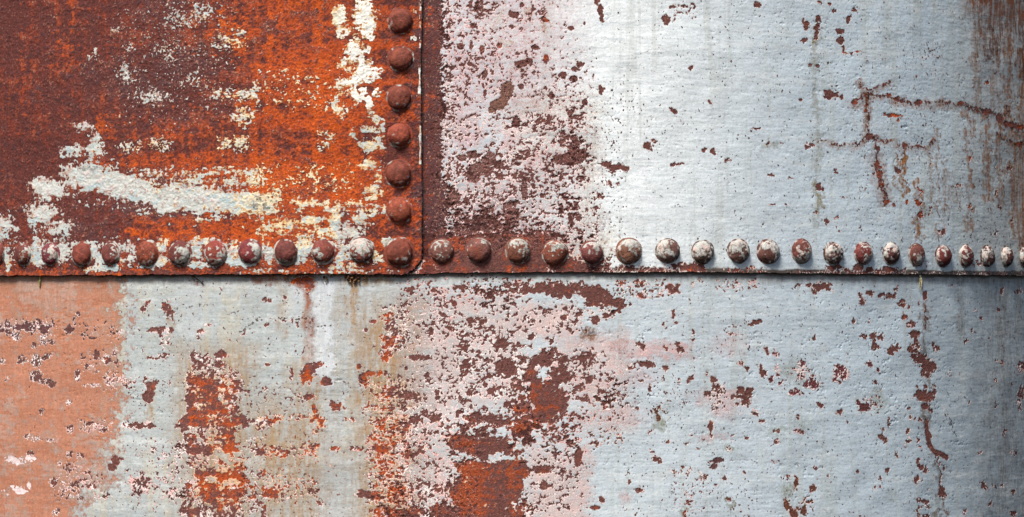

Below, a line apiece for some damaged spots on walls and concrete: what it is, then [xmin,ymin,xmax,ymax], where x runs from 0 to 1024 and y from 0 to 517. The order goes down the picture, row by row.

rust [961,0,1024,247]
rust [893,147,926,239]
rust [261,274,315,336]
peeling [0,0,630,517]
peeling [794,281,834,299]
rust [790,260,1024,276]
rust [0,311,137,392]
rust [49,304,640,517]
peeling [841,285,952,517]
peeling [995,358,1024,411]
peeling [781,474,817,517]
peeling [980,480,1016,506]